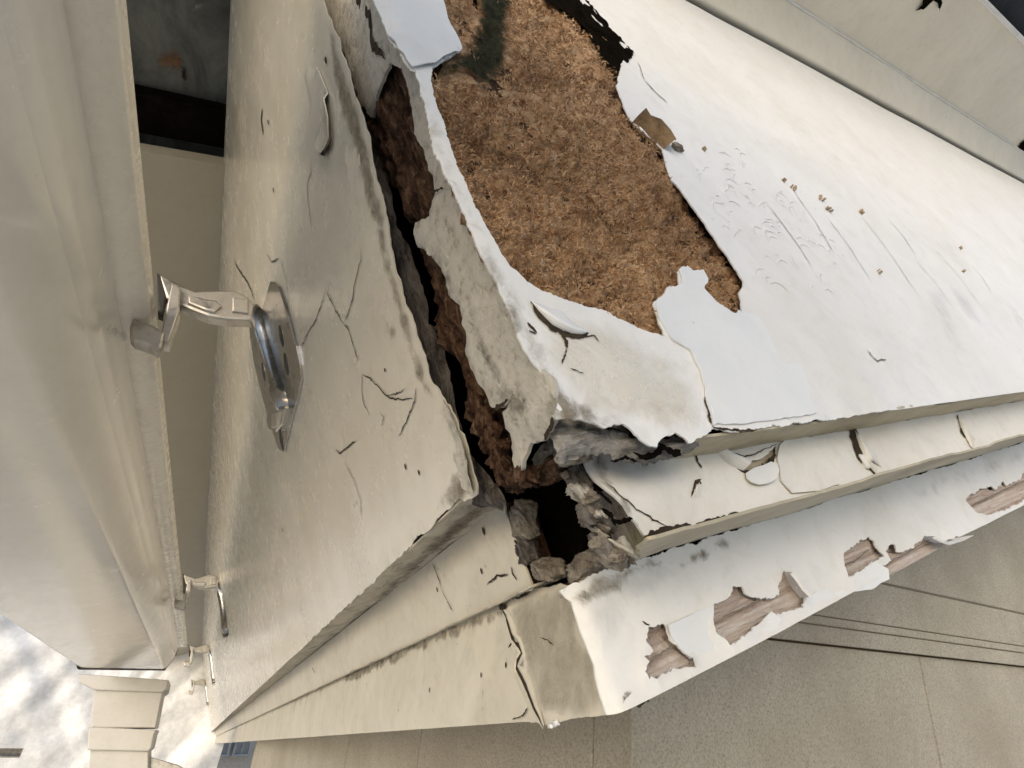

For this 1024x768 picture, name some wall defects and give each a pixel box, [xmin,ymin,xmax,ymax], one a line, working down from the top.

peeling [375,0,817,426]
crack [300,260,416,435]
crack [527,301,599,374]
crack [494,399,508,411]
crack [544,417,554,440]
peeling [549,419,699,467]
peeling [718,437,841,493]
peeling [966,473,1024,515]
peeling [644,535,974,678]
crack [487,567,554,729]